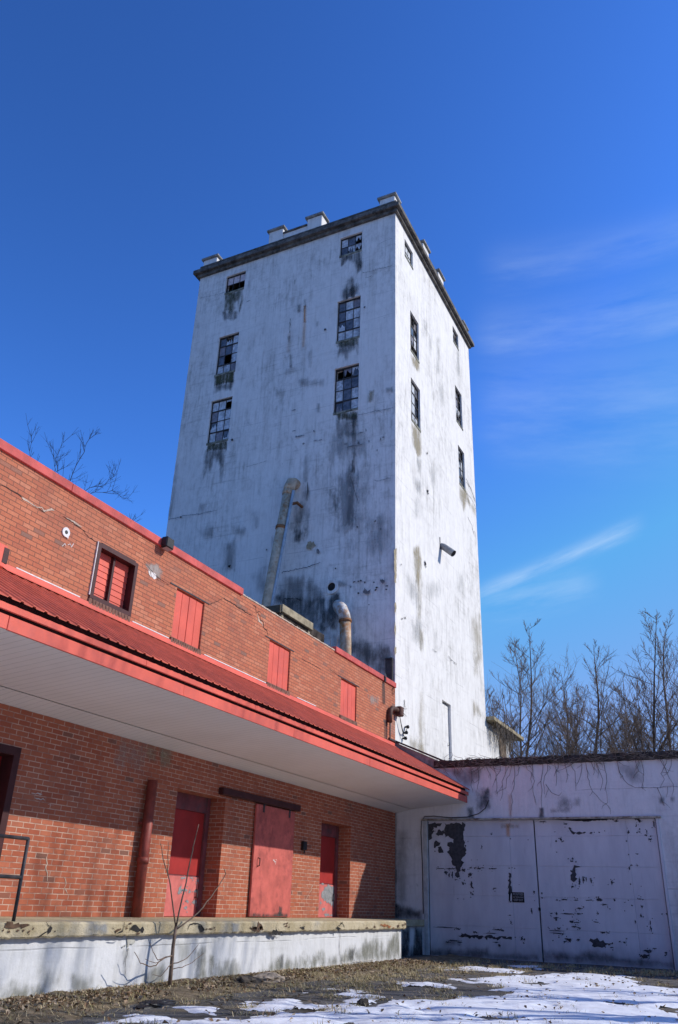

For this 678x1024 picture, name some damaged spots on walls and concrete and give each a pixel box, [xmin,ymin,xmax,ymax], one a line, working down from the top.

leakage [341,253,362,298]
leakage [337,412,357,454]
crack [2,485,97,542]
leakage [341,467,359,526]
crack [211,598,268,633]
leakage [276,593,339,631]
leakage [351,643,388,670]
peeling [428,822,515,902]
peeling [540,819,667,950]
spalling [1,922,56,937]
spalling [250,921,305,935]
peeling [320,883,345,932]